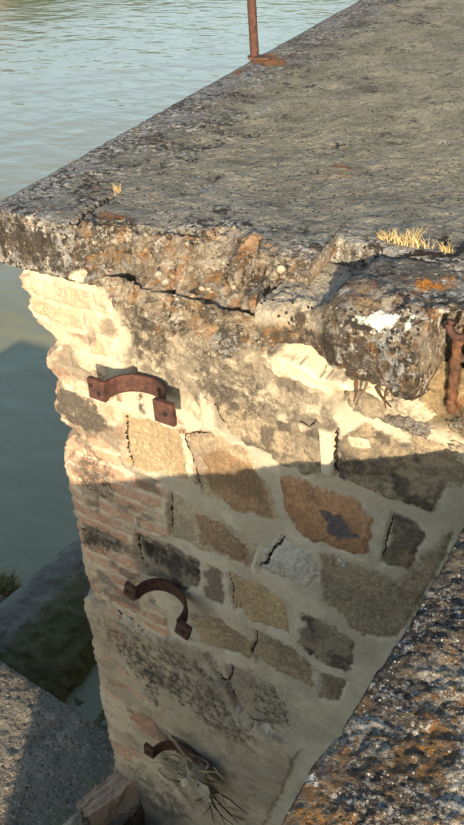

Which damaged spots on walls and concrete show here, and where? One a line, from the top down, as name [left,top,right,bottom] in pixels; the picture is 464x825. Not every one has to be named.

rust [235,53,287,75]
crack [395,244,464,257]
spalling [69,215,335,316]